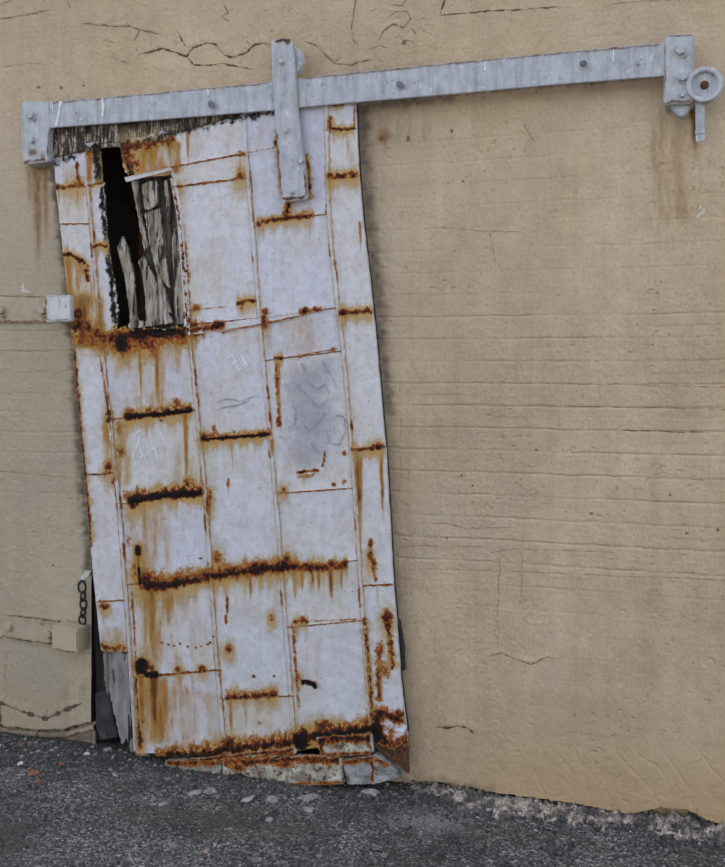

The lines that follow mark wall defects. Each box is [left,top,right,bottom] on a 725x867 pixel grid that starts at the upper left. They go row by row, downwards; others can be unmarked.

crack [0,0,273,69]
crack [304,0,416,66]
crack [435,0,558,16]
corrosion [0,132,410,782]
crack [401,522,725,674]
crack [0,653,95,737]